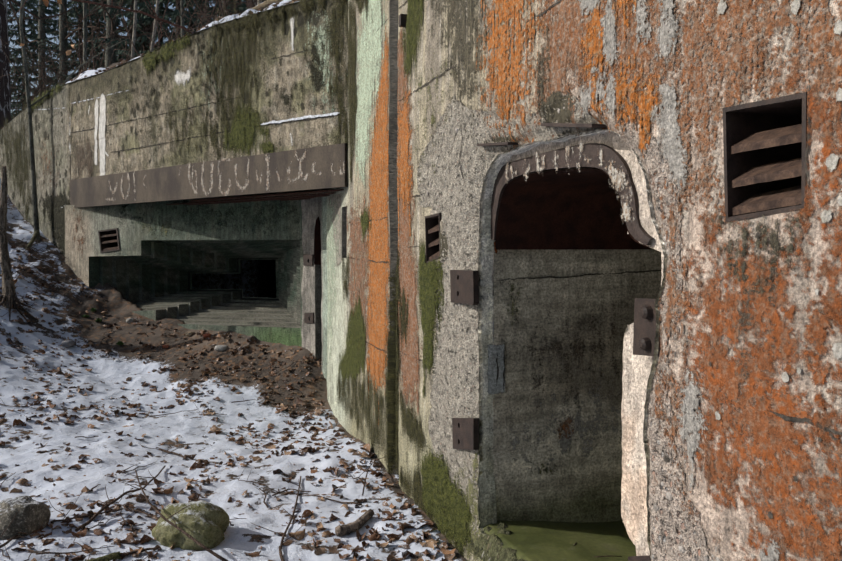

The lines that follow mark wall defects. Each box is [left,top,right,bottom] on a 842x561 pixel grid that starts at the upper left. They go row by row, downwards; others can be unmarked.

water stain [174,67,192,86]
water stain [68,94,321,242]
water stain [289,0,387,199]
corrosion [345,26,423,425]
crack [499,269,661,281]
corrosion [476,0,842,561]
crack [767,410,842,441]
water stain [452,447,494,561]